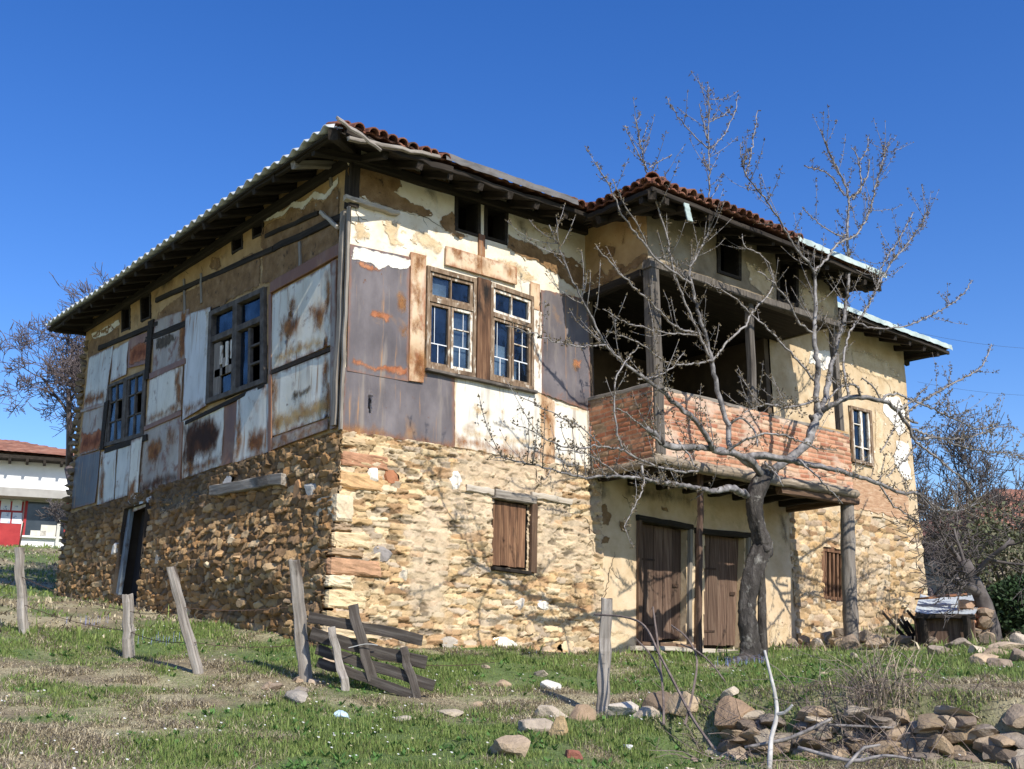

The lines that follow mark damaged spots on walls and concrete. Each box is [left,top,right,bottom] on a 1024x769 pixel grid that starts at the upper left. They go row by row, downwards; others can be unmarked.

flaking render [157,163,469,319]
flaking render [495,235,648,293]
rust [277,299,320,358]
rust [312,281,330,324]
rust [353,354,424,376]
rust [128,312,219,500]
rust [236,363,330,457]